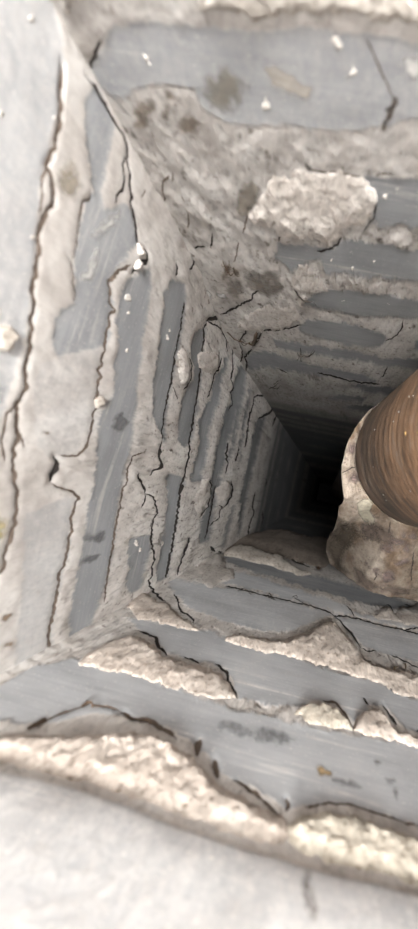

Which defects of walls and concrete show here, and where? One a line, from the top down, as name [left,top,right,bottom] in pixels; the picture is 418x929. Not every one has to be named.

crack [234,213,248,262]
peeling [248,168,378,247]
crack [318,237,342,253]
crack [0,63,63,574]
crack [46,40,213,647]
peeling [237,264,328,334]
crack [318,368,387,385]
crack [104,290,299,623]
peeling [215,480,231,501]
spalling [357,499,375,524]